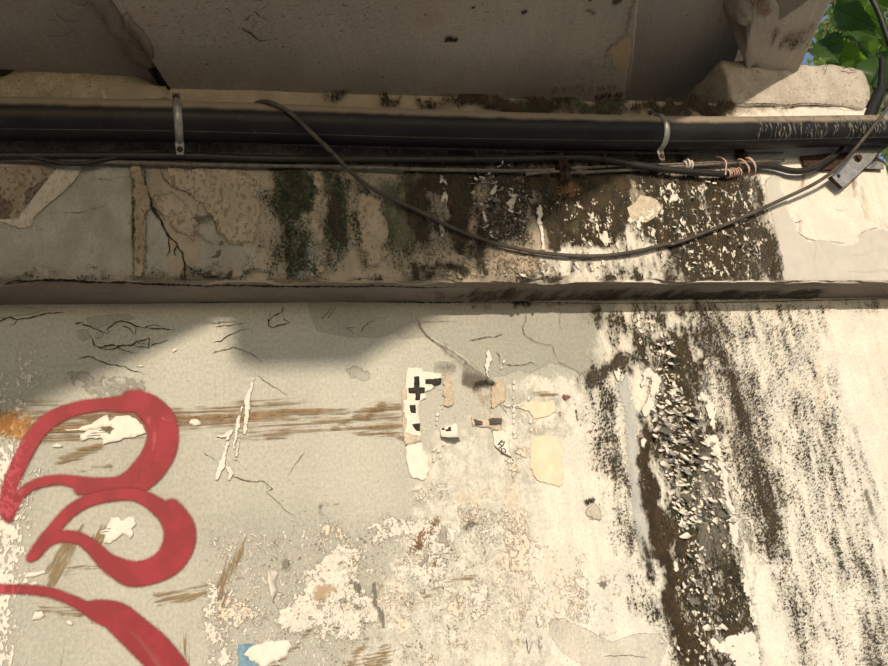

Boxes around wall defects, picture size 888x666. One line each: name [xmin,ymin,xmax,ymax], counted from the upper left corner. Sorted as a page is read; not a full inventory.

spalling [0,165,56,219]
crack [160,168,222,240]
peeling [152,166,263,273]
peeling [306,169,333,280]
leakage [258,163,383,280]
peeling [355,190,390,270]
crack [0,196,888,394]
leakage [376,149,888,666]
peeling [202,400,624,666]
peeling [633,313,762,666]